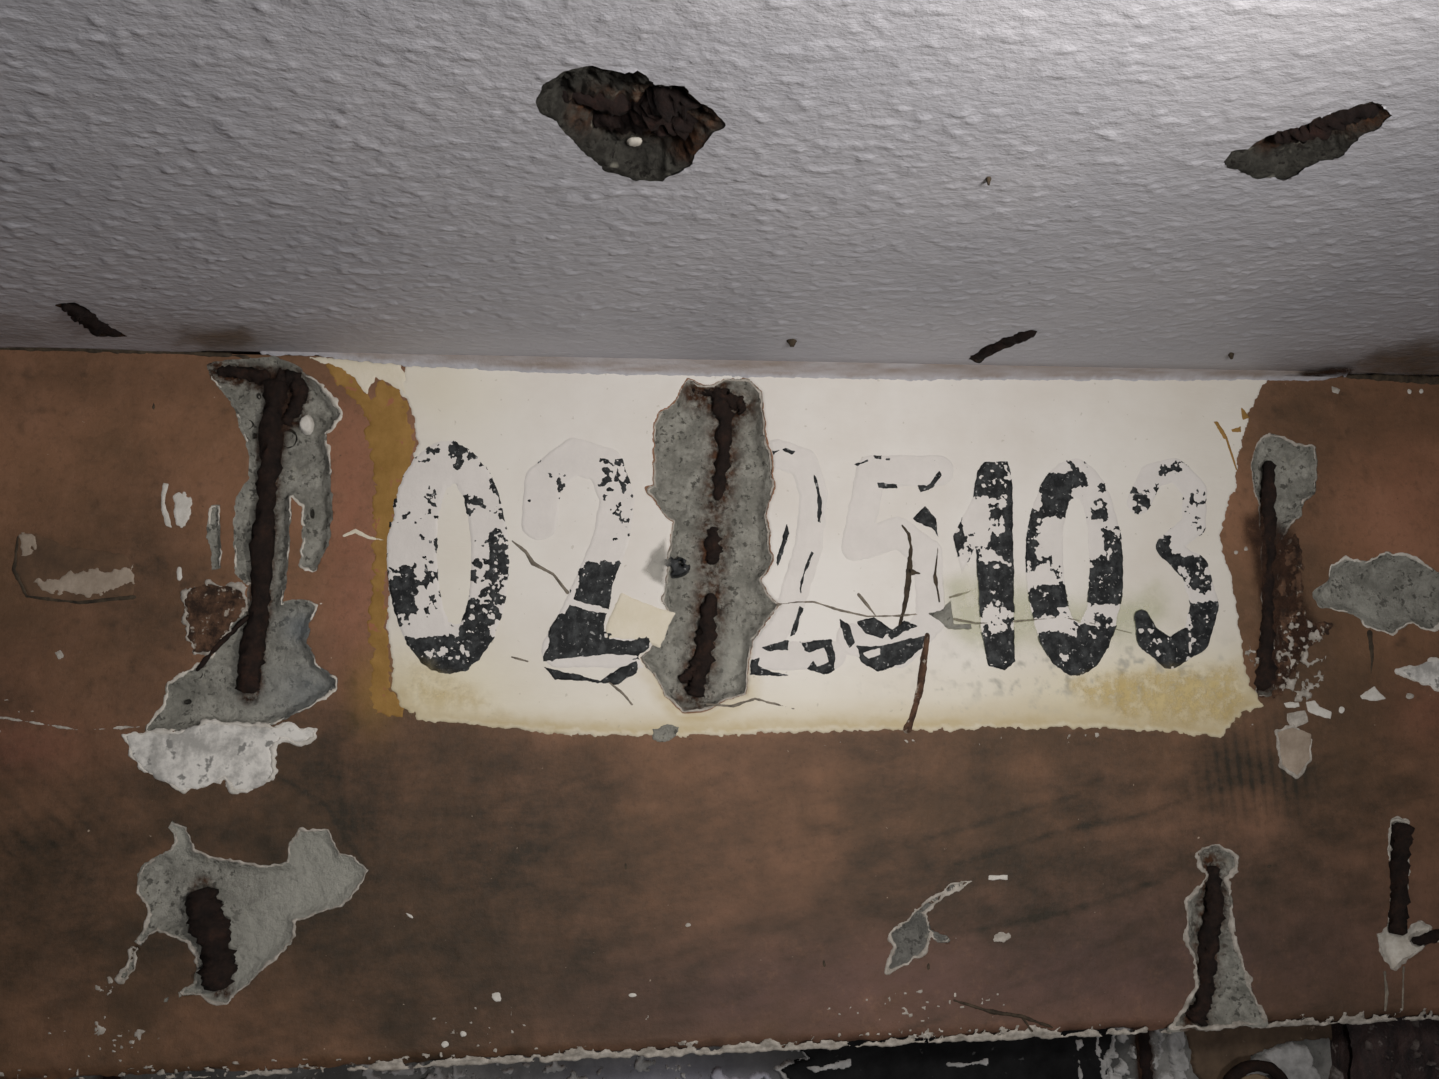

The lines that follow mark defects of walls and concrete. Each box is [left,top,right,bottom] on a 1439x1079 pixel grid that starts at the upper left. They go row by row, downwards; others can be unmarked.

spalling [536,66,726,182]
spalling [1224,102,1392,180]
peeling [12,532,136,604]
spalling [121,354,343,794]
spalling [641,379,778,742]
spalling [1234,433,1439,779]
spalling [95,1016,145,1044]
spalling [118,1059,326,1079]
spalling [95,821,368,1006]
spalling [347,844,1439,1079]
spalling [1377,816,1439,971]